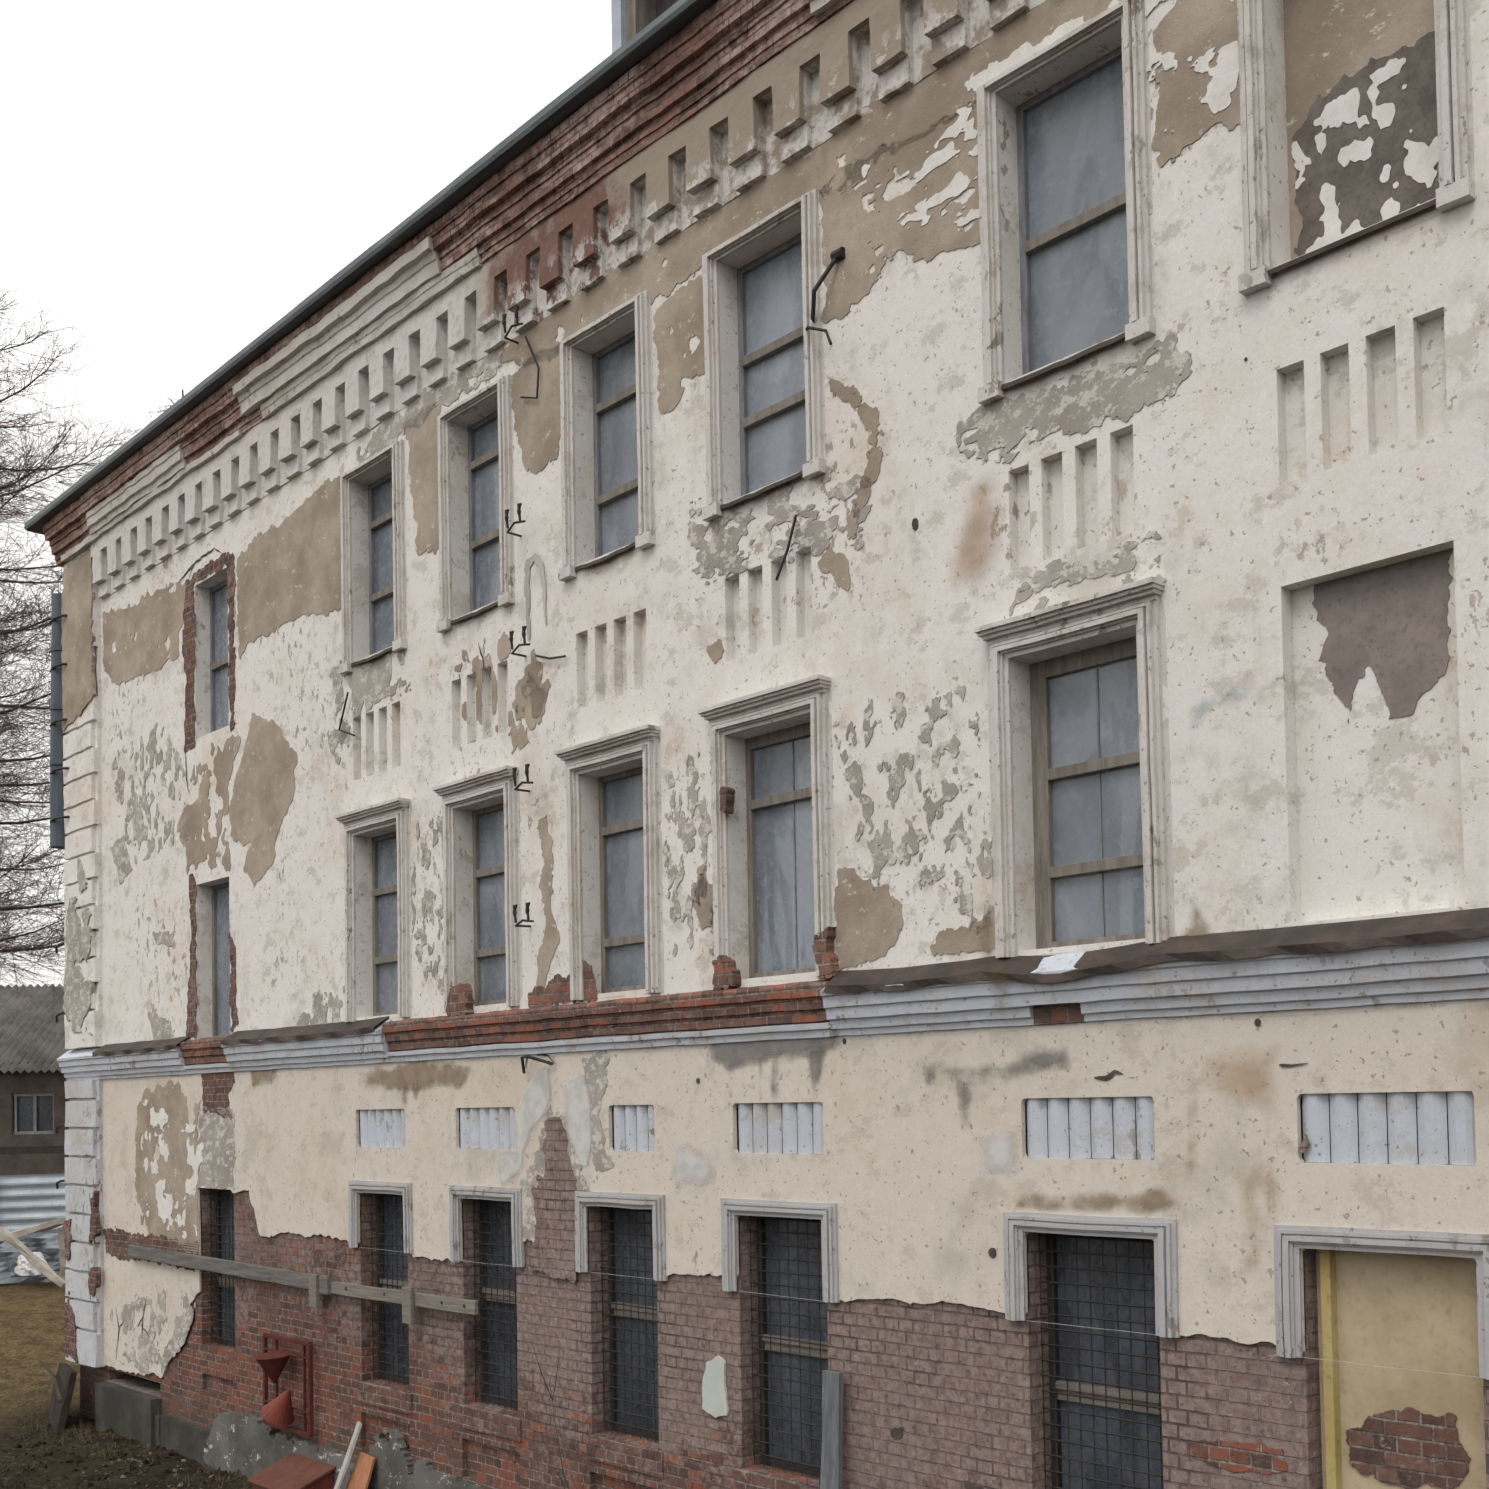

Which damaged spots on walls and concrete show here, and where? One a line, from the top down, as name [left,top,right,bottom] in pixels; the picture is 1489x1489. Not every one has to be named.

flaking render [1145,0,1241,167]
peeling [1291,31,1439,256]
flaking render [356,0,1122,555]
peeling [956,332,1192,463]
flaking render [1312,548,1453,724]
flaking render [61,476,345,1041]
peeling [812,685,995,979]
flaking render [62,1062,236,1375]
flaking render [520,1050,614,1284]
flaking render [702,1356,729,1418]
spalling [1190,1440,1287,1475]
spalling [1346,1407,1471,1489]